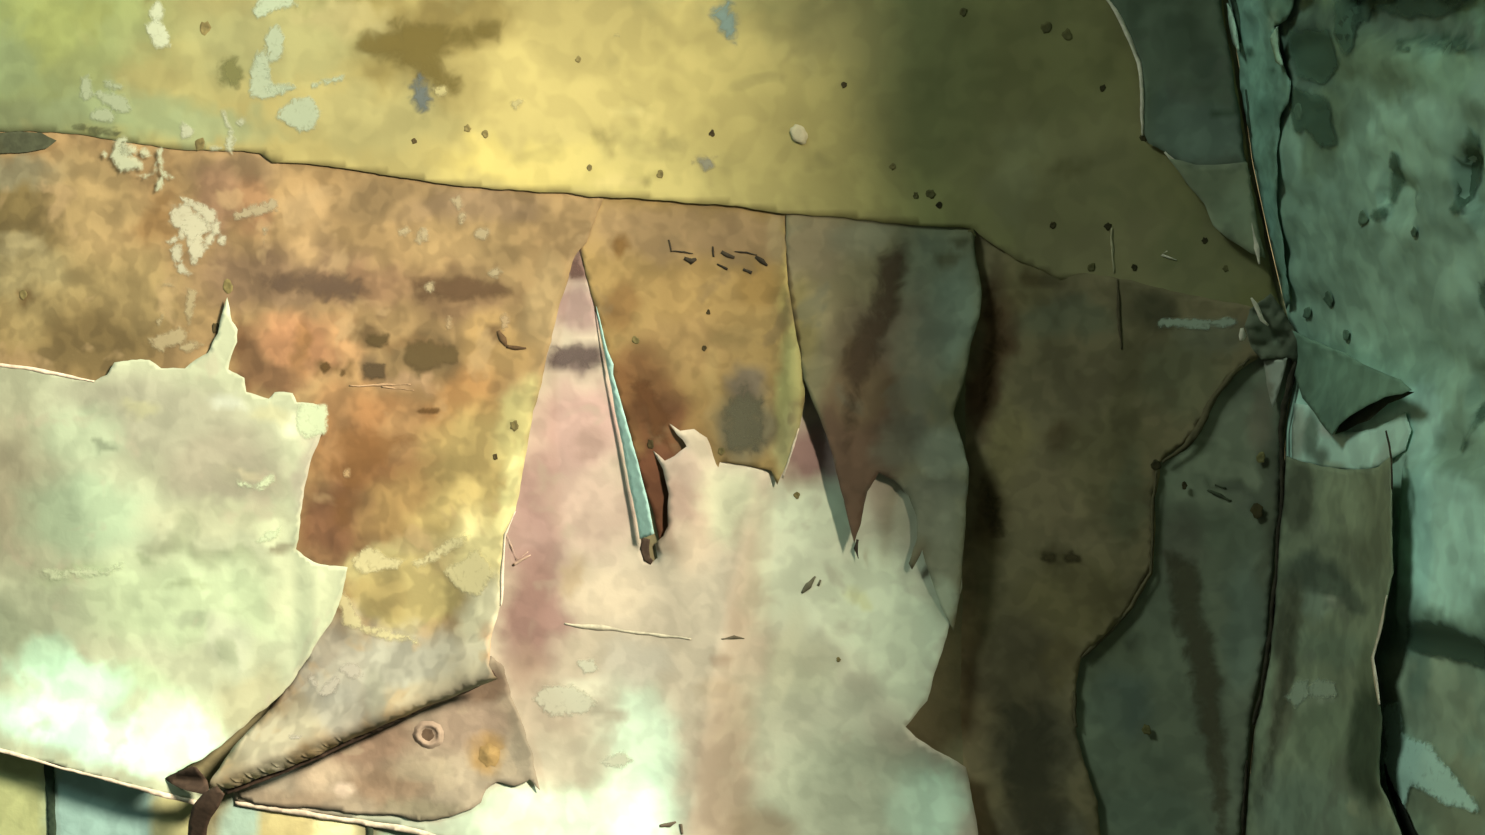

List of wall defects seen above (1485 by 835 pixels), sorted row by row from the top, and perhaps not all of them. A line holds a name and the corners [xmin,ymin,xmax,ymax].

peeling [146,2,169,47]
peeling [250,0,343,131]
water stain [359,24,497,112]
peeling [103,138,173,191]
flaking render [1227,0,1333,318]
peeling [149,197,277,352]
peeling [297,405,328,437]
flaking render [1292,403,1412,469]
peeling [353,536,492,596]
crack [1073,358,1250,727]
crack [1252,361,1297,725]
crack [1240,760,1248,835]